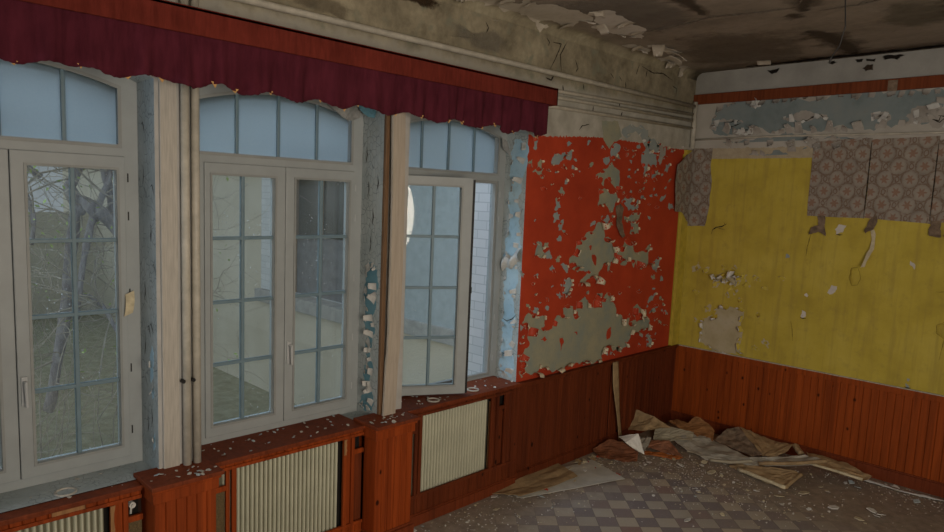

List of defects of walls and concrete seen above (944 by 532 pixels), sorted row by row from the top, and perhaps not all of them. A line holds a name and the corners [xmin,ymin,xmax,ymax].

flaking render [456,0,690,77]
leakage [748,31,944,74]
peeling [709,88,944,156]
peeling [474,120,675,388]
peeling [360,262,449,424]
peeling [692,264,745,357]